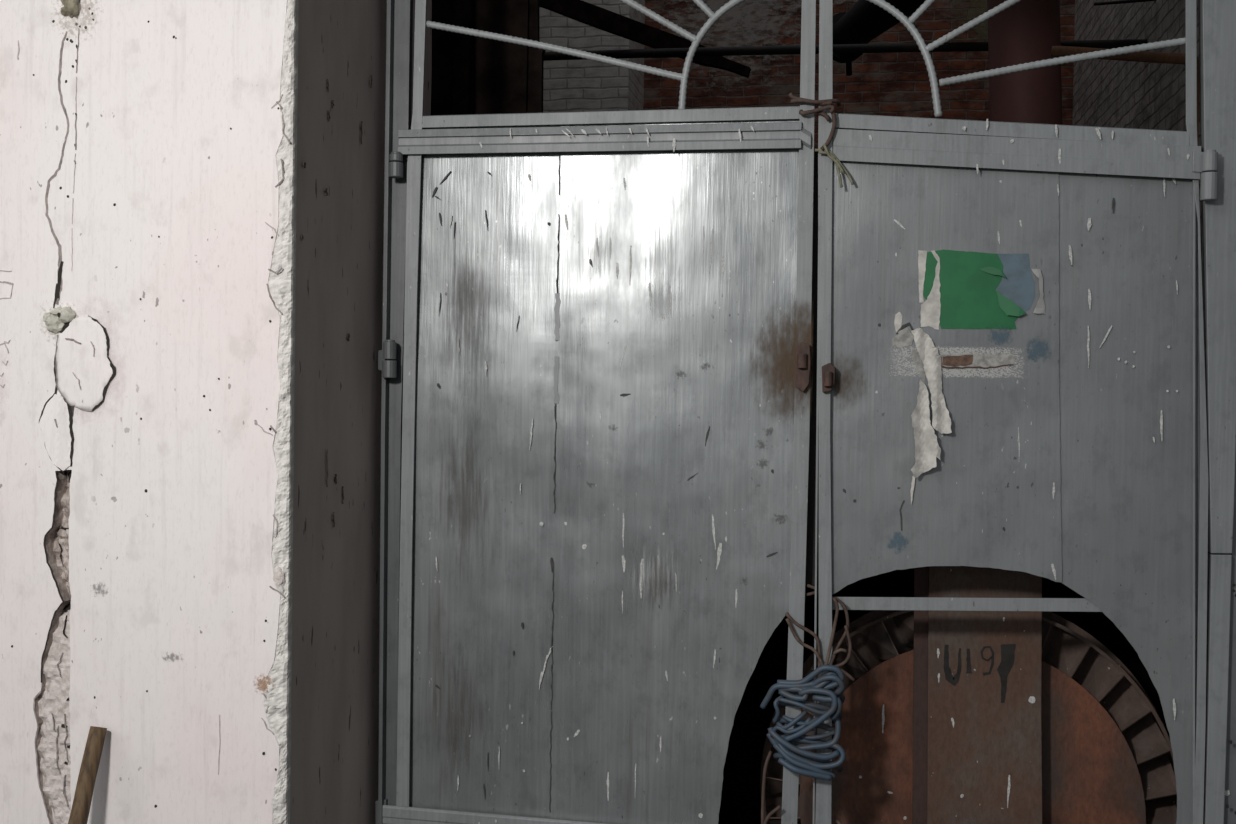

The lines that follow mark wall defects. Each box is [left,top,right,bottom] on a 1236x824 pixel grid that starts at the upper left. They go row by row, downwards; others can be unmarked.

crack [45,28,80,394]